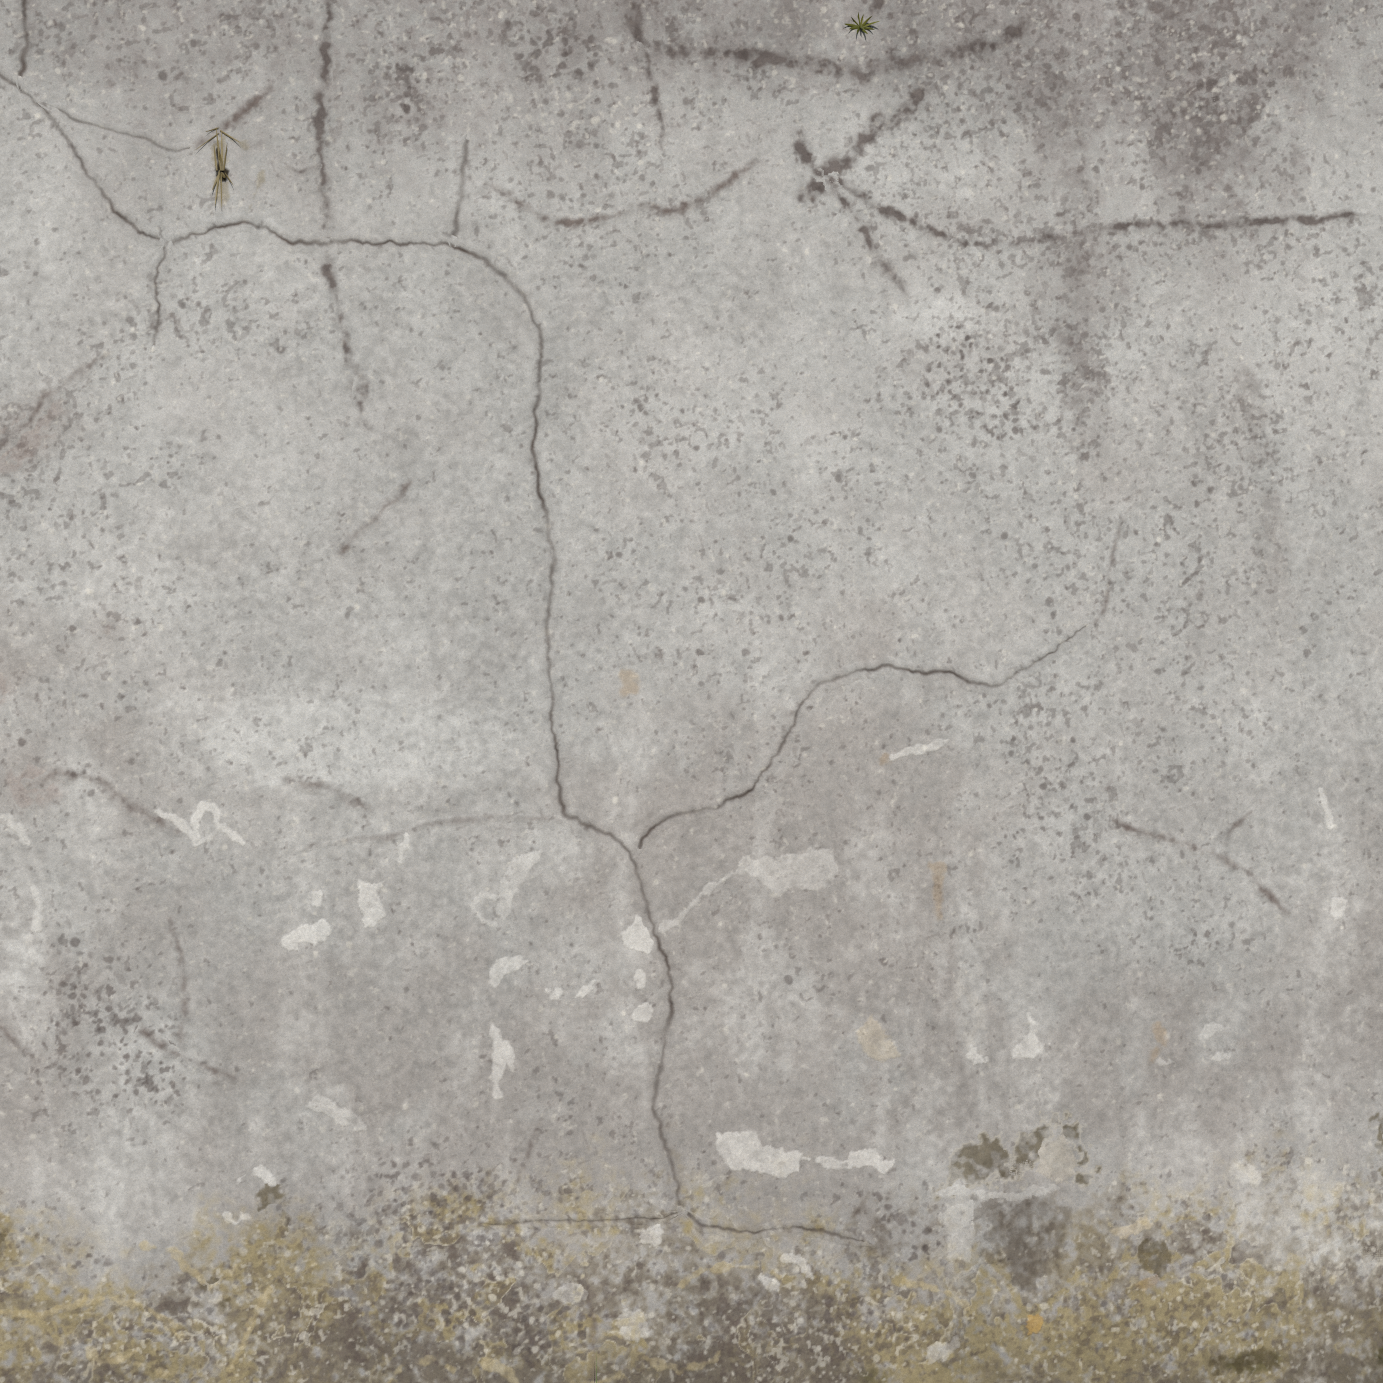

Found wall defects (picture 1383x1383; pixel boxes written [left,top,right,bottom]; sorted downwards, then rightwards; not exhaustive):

crack [0,0,277,353]
crack [612,0,1375,303]
crack [165,0,1153,1382]
crack [20,764,184,838]
peeling [153,800,246,848]
peeling [619,843,841,1023]
peeling [488,1022,515,1101]
spalling [713,1109,1102,1295]
leakage [1224,1167,1383,1307]
leakage [83,1344,179,1382]
leakage [480,1356,524,1383]
leakage [1302,1351,1326,1383]